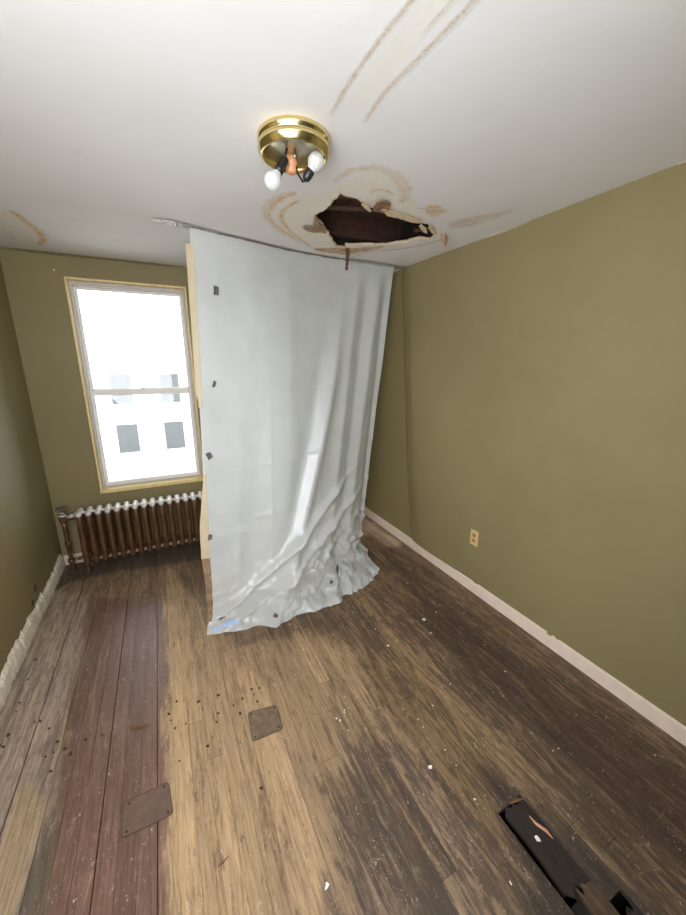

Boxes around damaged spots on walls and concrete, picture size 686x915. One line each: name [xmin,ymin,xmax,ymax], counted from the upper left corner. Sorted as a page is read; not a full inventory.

crack [326,0,480,126]
water stain [0,208,50,247]
flaking render [302,192,449,271]
water stain [257,163,517,257]